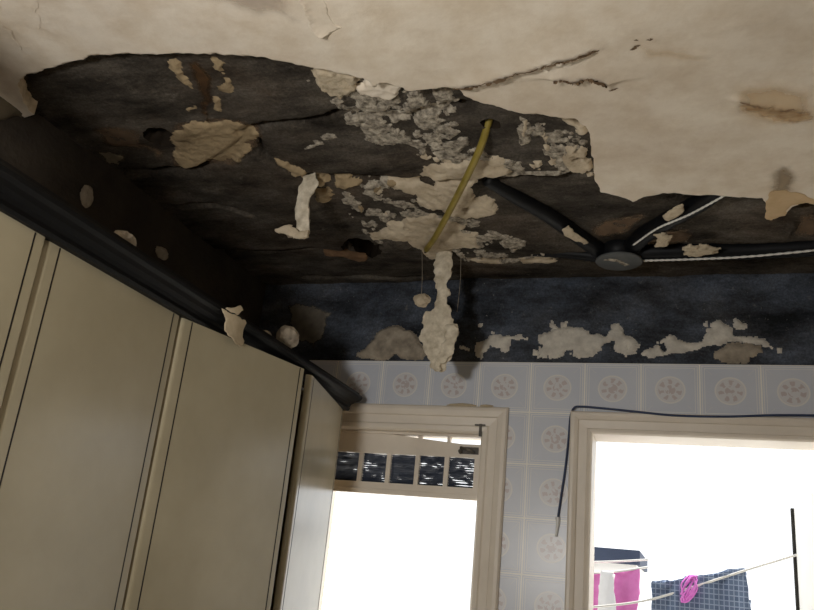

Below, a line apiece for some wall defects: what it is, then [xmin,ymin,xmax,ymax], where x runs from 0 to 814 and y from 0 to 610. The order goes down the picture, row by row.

crack [453,50,618,91]
water stain [740,102,810,122]
spalling [24,53,693,361]
flaking render [446,177,814,365]